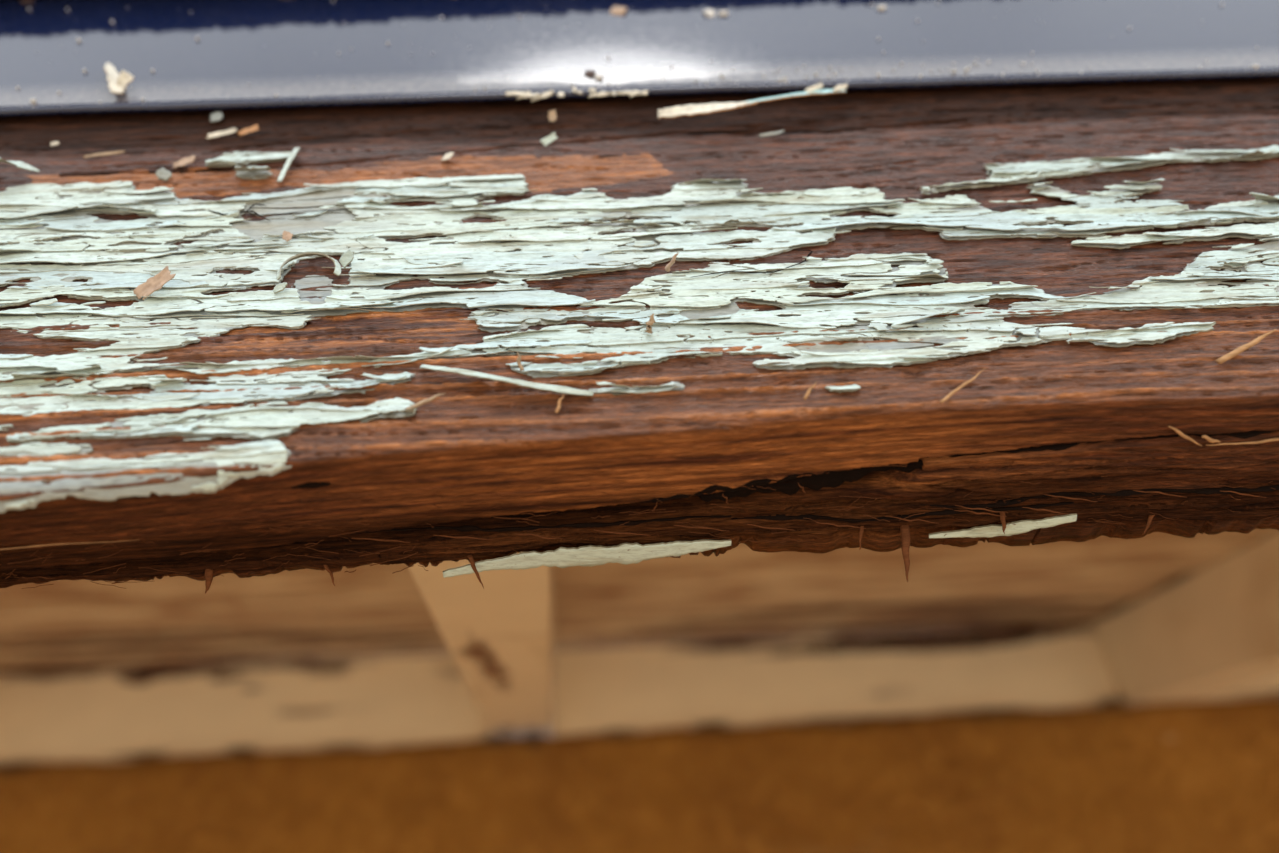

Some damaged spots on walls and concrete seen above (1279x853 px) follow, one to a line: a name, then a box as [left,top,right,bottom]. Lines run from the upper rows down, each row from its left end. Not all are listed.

peeling [658,82,848,119]
peeling [206,112,237,139]
peeling [540,132,558,147]
peeling [0,145,1279,513]
crack [349,484,1279,543]
peeling [929,513,1077,538]